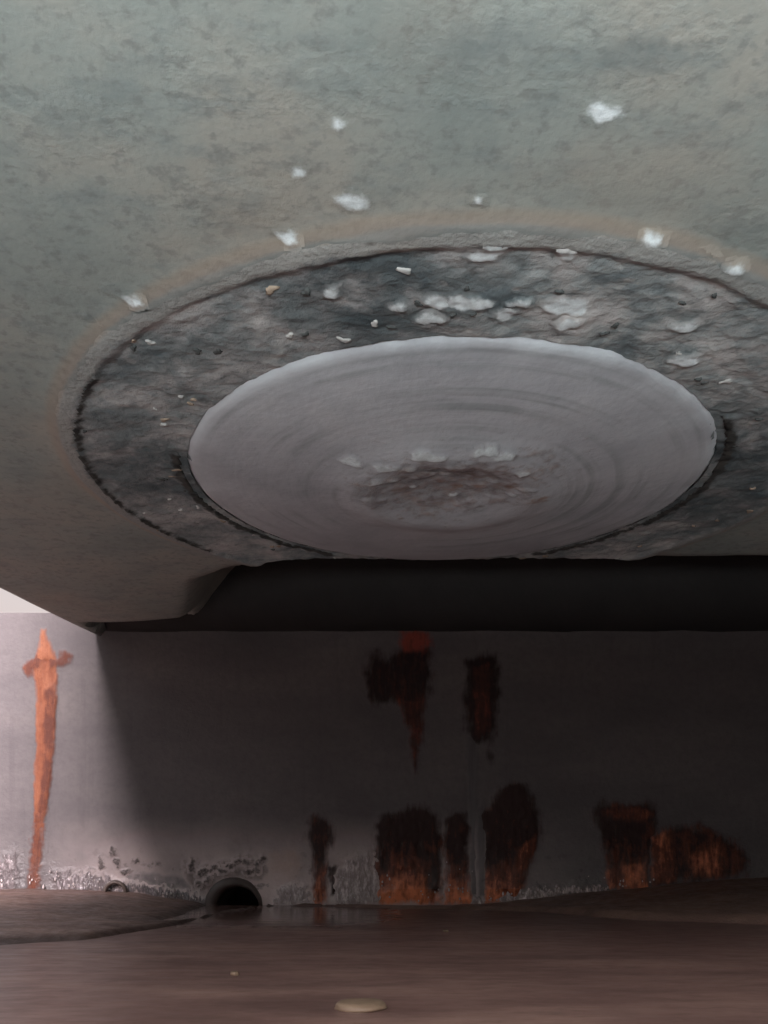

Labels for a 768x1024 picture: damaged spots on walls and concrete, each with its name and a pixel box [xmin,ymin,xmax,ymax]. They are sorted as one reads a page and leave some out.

leakage [316,283,343,301]
leakage [462,246,513,264]
leakage [384,290,595,333]
leakage [665,316,706,336]
spalling [55,229,768,567]
crack [72,374,342,557]
rust [354,631,441,779]
rust [19,626,77,889]
rust [363,646,551,905]
leakage [0,843,206,904]
rust [297,806,342,905]
rust [582,793,755,890]